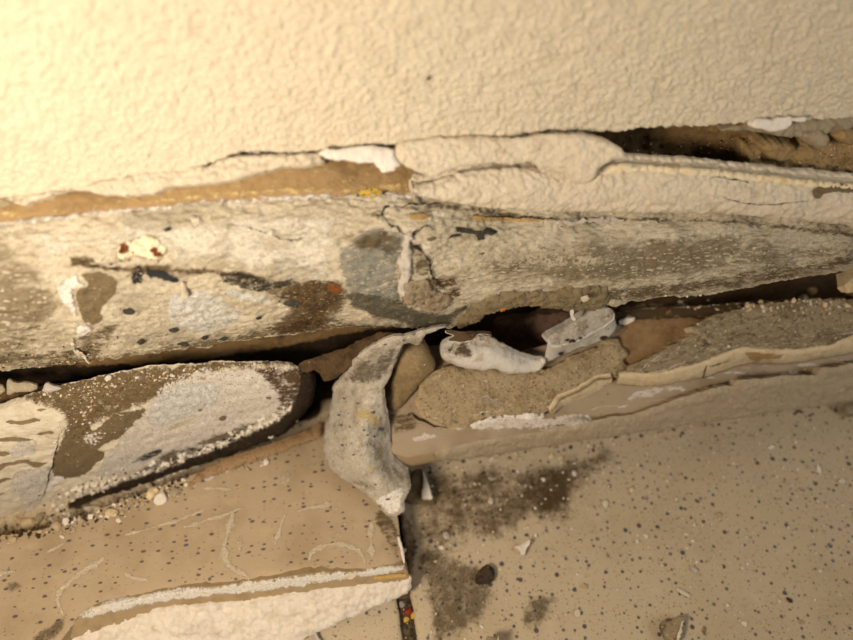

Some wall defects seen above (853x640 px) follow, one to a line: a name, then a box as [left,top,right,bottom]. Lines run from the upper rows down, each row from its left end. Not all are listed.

crack [503,122,585,138]
peeling [0,116,853,228]
crack [709,176,807,205]
spalling [836,269,853,293]
peeling [76,271,117,325]
peeling [472,336,506,348]
flaking render [0,378,62,395]
spalling [548,335,853,414]
peeling [52,408,146,478]
flaking render [146,487,168,506]